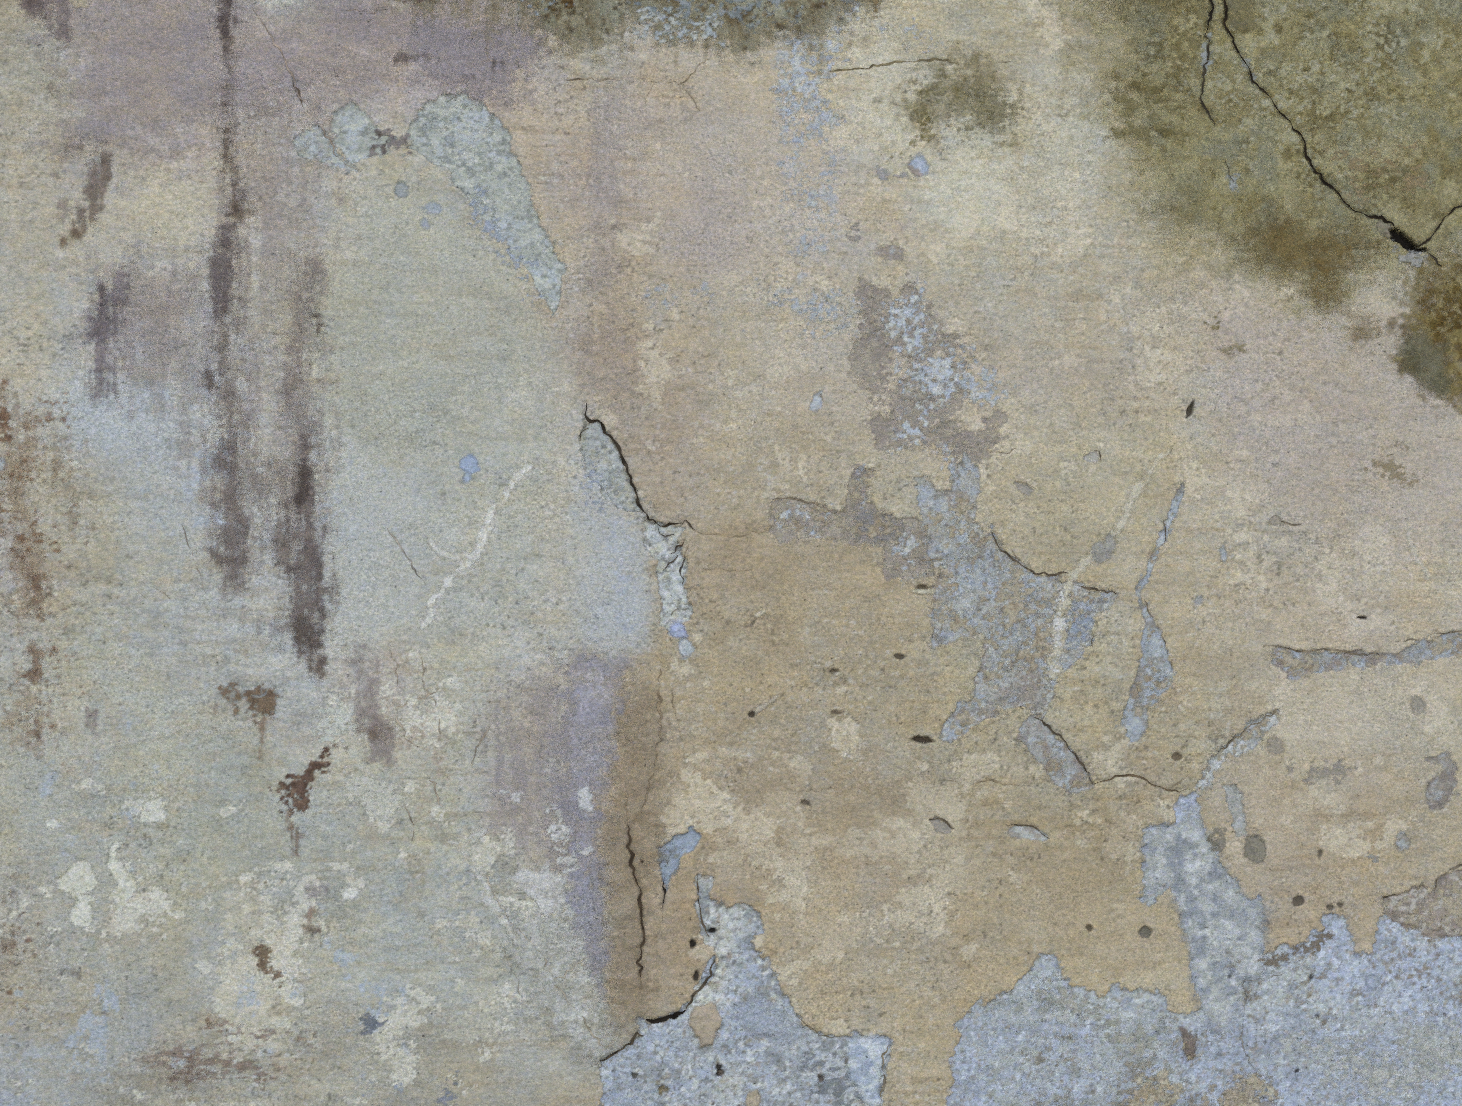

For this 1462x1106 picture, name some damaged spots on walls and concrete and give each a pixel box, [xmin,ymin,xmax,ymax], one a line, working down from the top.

peeling [293,93,566,315]
crack [1200,0,1462,267]
rust [0,401,66,442]
crack [580,403,766,572]
peeling [769,245,1184,793]
rust [22,646,59,684]
rust [218,682,279,742]
rust [269,747,331,853]
crack [387,462,715,1063]
peeling [513,784,593,922]
spalling [599,873,893,1106]
spalling [946,709,1462,1106]